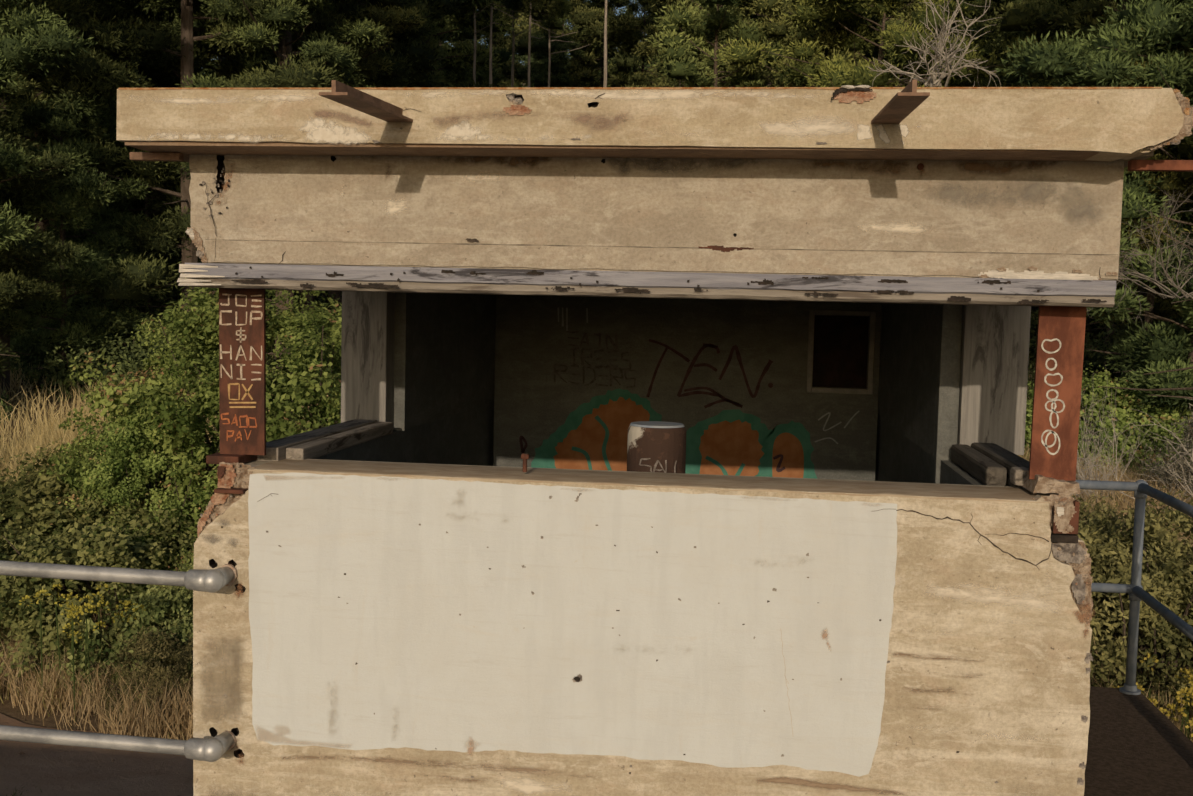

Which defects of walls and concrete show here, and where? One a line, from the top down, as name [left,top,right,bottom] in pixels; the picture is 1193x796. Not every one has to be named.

spalling [831,85,877,104]
spalling [1146,89,1193,150]
spalling [186,227,208,263]
spalling [196,462,256,539]
crack [871,509,1052,569]
spalling [1041,493,1093,626]